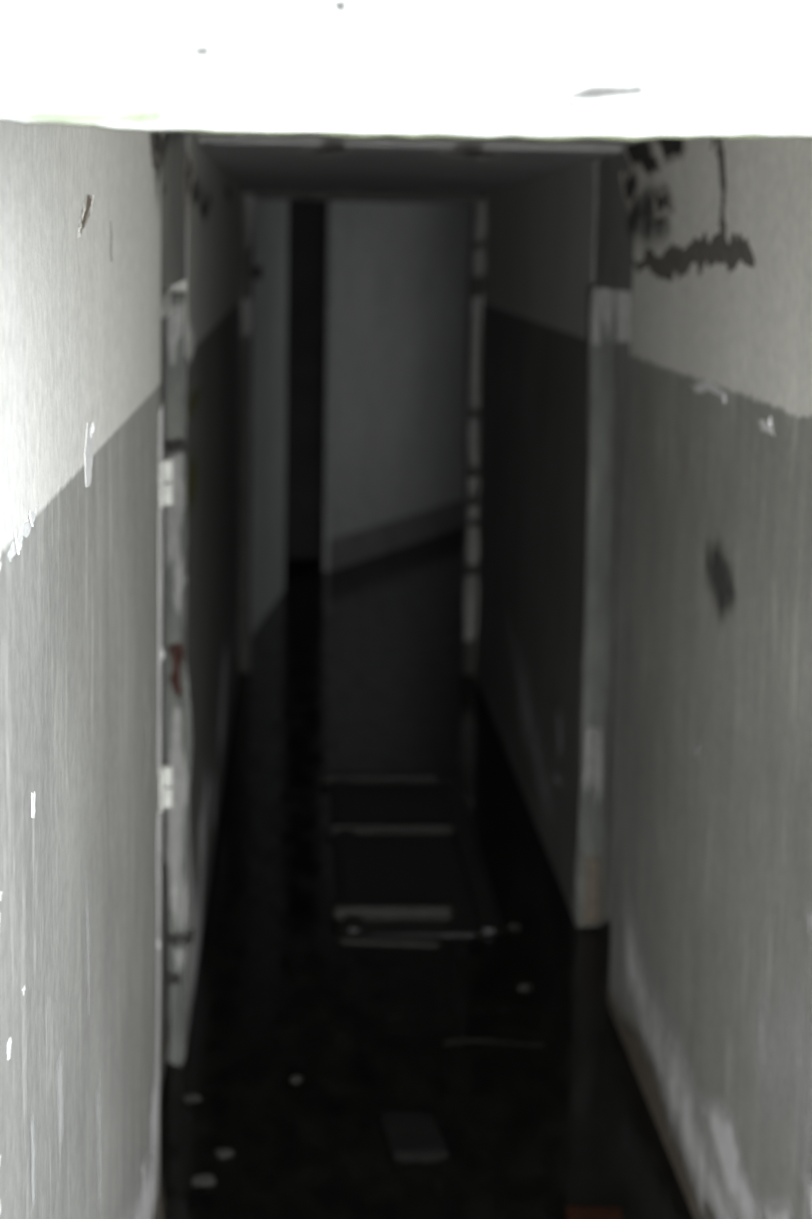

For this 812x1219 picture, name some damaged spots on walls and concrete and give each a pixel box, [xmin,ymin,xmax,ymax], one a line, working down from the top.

spalling [150,132,164,170]
crack [0,119,812,283]
spalling [591,287,615,347]
peeling [690,381,726,404]
peeling [84,421,94,487]
peeling [759,416,775,437]
peeling [0,502,39,569]
water stain [186,642,228,1024]
water stain [134,872,167,1219]
water stain [604,919,790,1219]